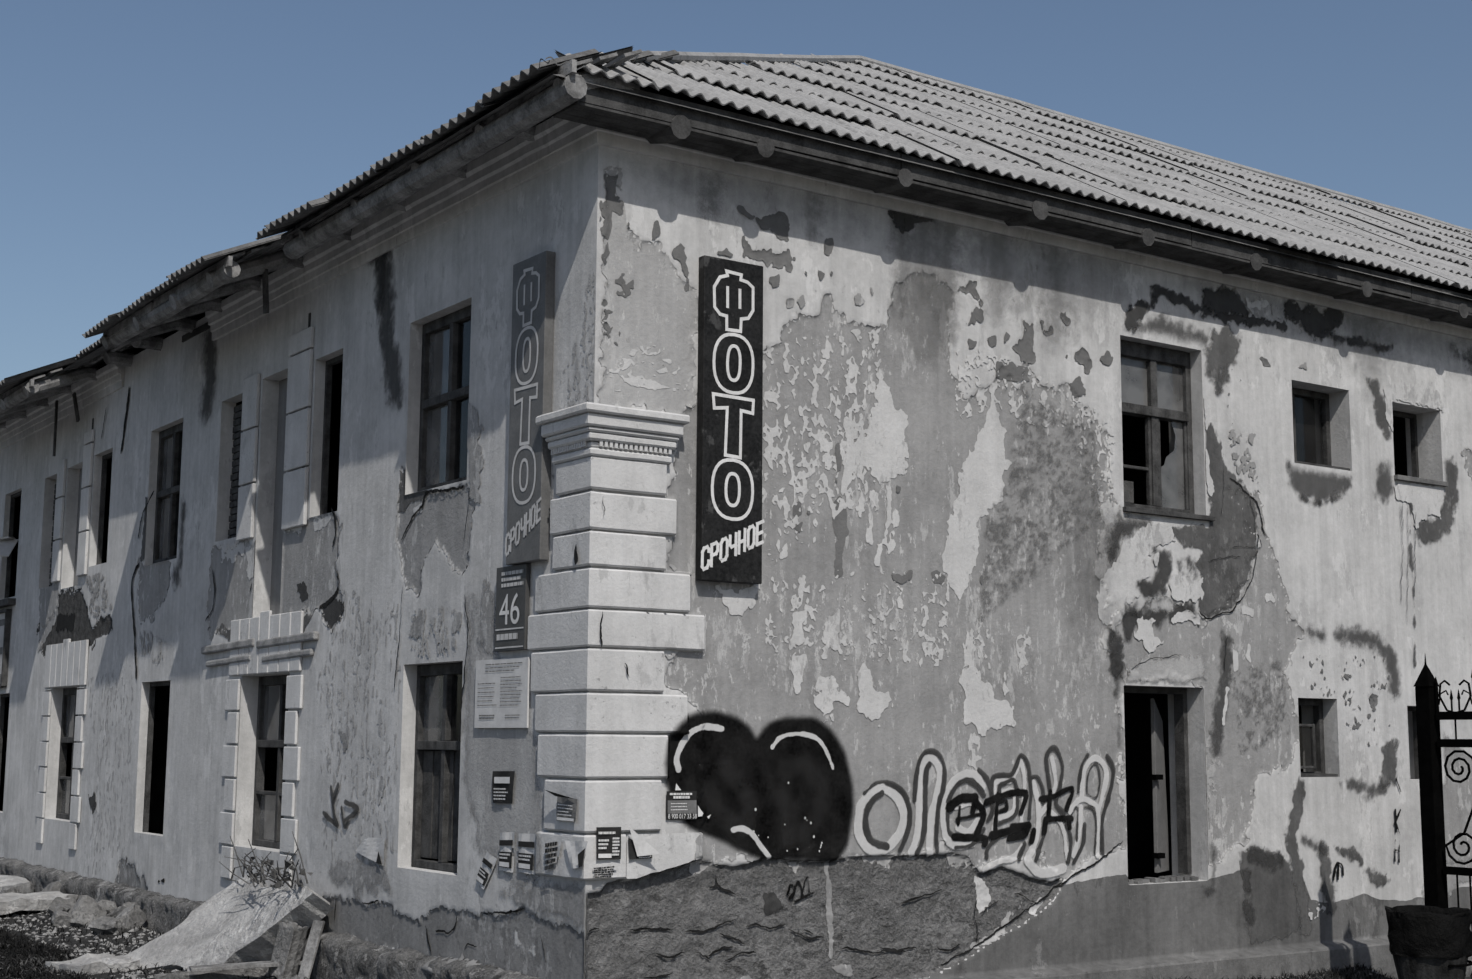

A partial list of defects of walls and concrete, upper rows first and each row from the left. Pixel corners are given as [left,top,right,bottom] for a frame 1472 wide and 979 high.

damp [371,251,401,409]
peeling [1461,448,1472,478]
flaking render [37,573,113,659]
peeling [137,497,185,664]
flaking render [206,539,256,641]
peeling [280,166,1398,979]
peeling [85,666,165,891]
crack [586,841,1123,979]